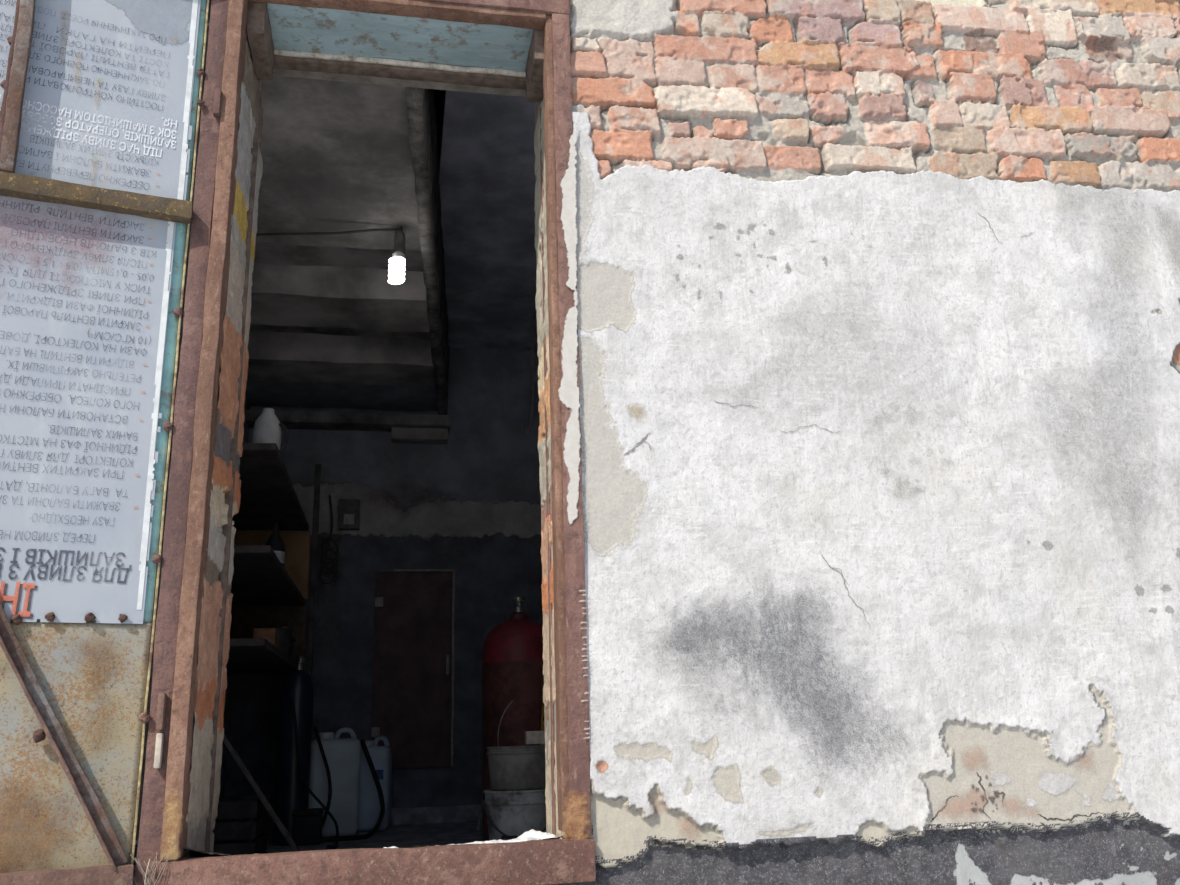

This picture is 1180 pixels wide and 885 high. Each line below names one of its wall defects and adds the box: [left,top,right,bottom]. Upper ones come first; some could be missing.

peeling [575,148,647,556]
spalling [1170,344,1180,373]
crack [820,553,870,625]
rust [161,793,180,858]
flaking render [583,742,725,868]
peeling [692,737,743,803]
peeling [761,766,781,786]
flaking render [853,684,1141,847]